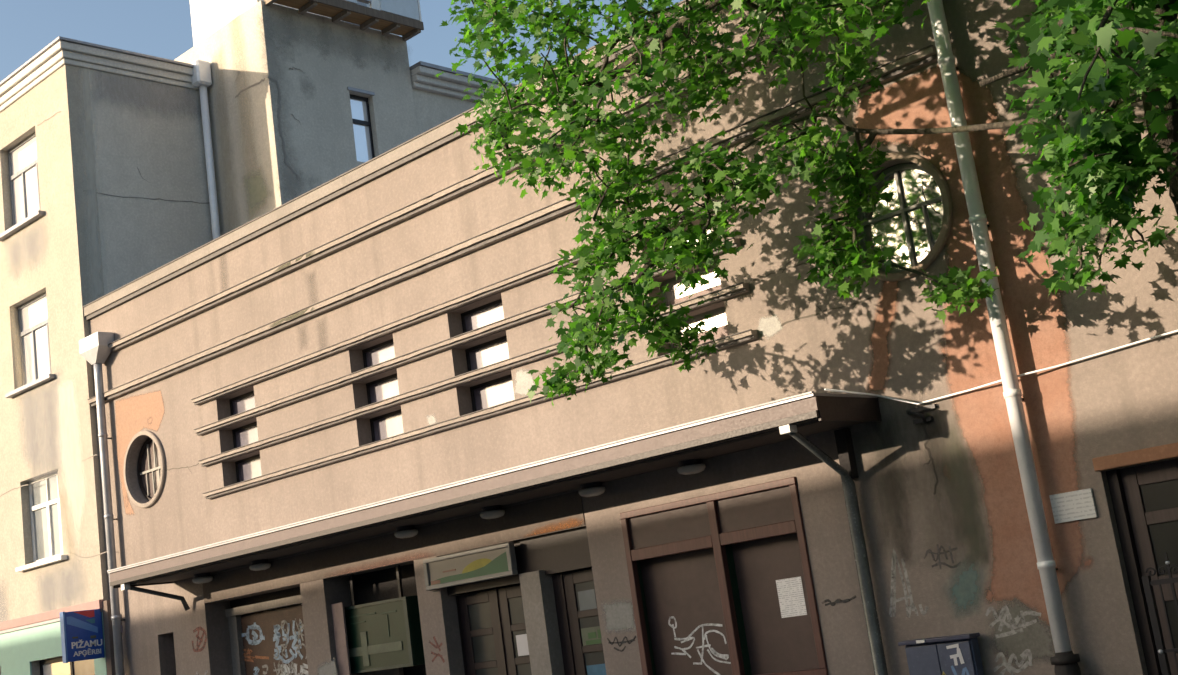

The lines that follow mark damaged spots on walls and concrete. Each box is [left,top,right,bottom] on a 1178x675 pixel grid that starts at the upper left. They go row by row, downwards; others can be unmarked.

crack [234,67,303,179]
crack [83,167,210,204]
crack [753,258,809,281]
crack [781,296,873,326]
peeling [855,65,1055,664]
peeling [956,69,1092,595]
peeling [115,391,164,515]